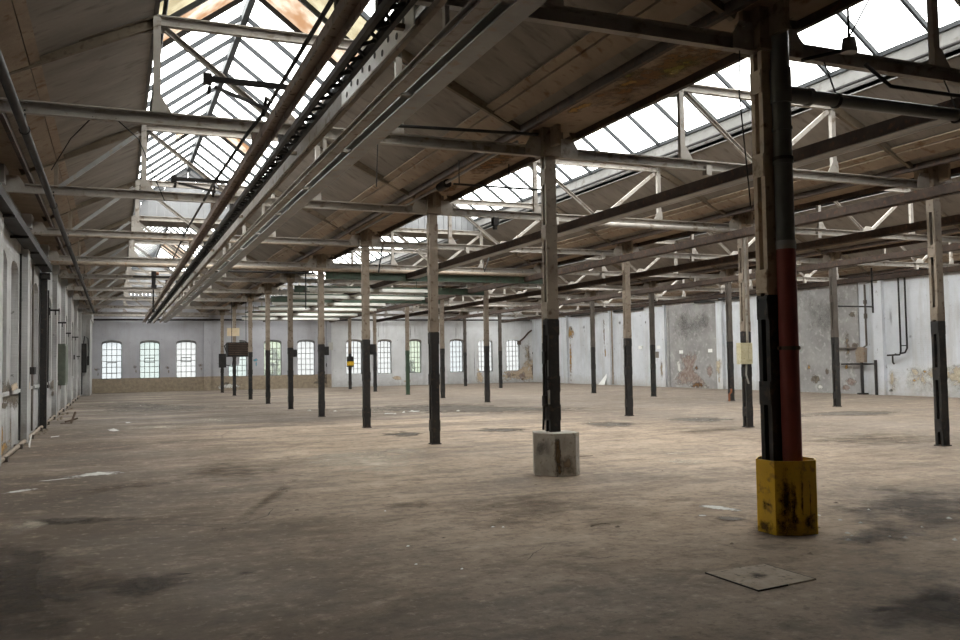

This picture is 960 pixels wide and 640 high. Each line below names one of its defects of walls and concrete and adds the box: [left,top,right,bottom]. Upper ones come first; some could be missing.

peeling [503,359,533,382]
peeling [676,353,712,388]